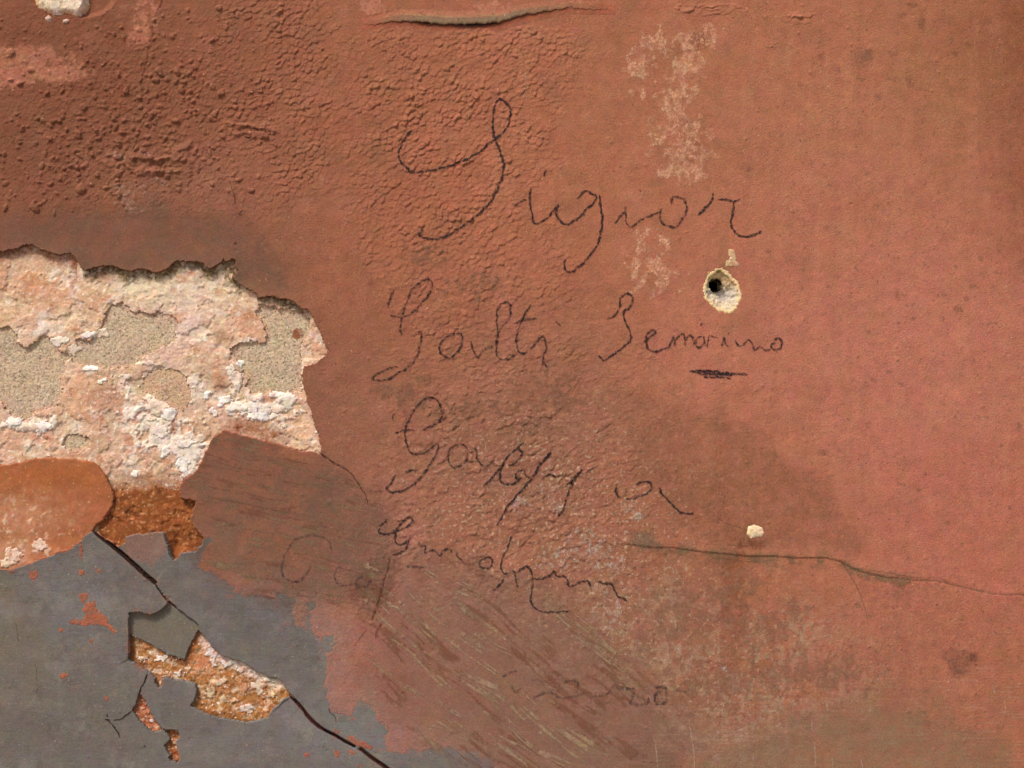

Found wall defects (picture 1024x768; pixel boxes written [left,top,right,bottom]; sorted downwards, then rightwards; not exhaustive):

spalling [0,245,496,768]
crack [92,531,174,606]
crack [675,519,1022,626]
crack [105,675,147,738]
crack [288,694,388,768]